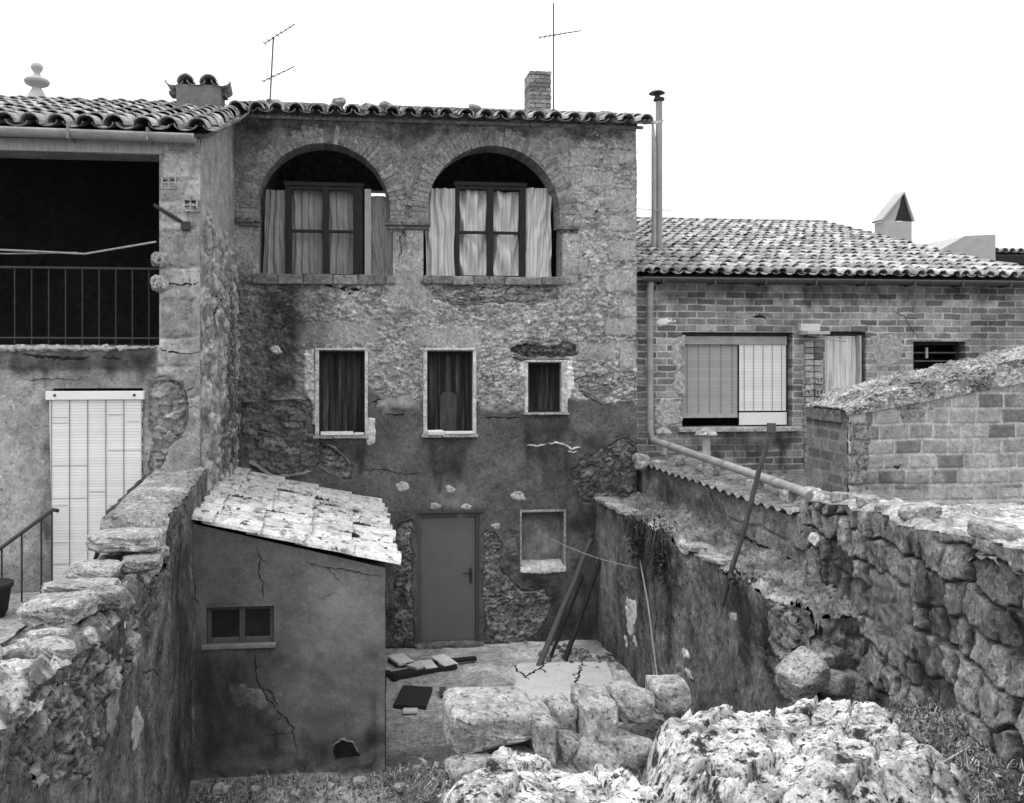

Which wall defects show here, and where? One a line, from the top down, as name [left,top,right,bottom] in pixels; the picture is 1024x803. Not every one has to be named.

flaking render [510,339,578,361]
flaking render [147,374,189,471]
flaking render [238,397,353,480]
flaking render [527,438,638,503]
crack [256,545,269,596]
crack [307,562,378,581]
flaking render [388,520,458,670]
flaking render [482,523,551,644]
crack [253,649,299,756]
crack [514,662,547,680]
spalling [332,738,361,759]